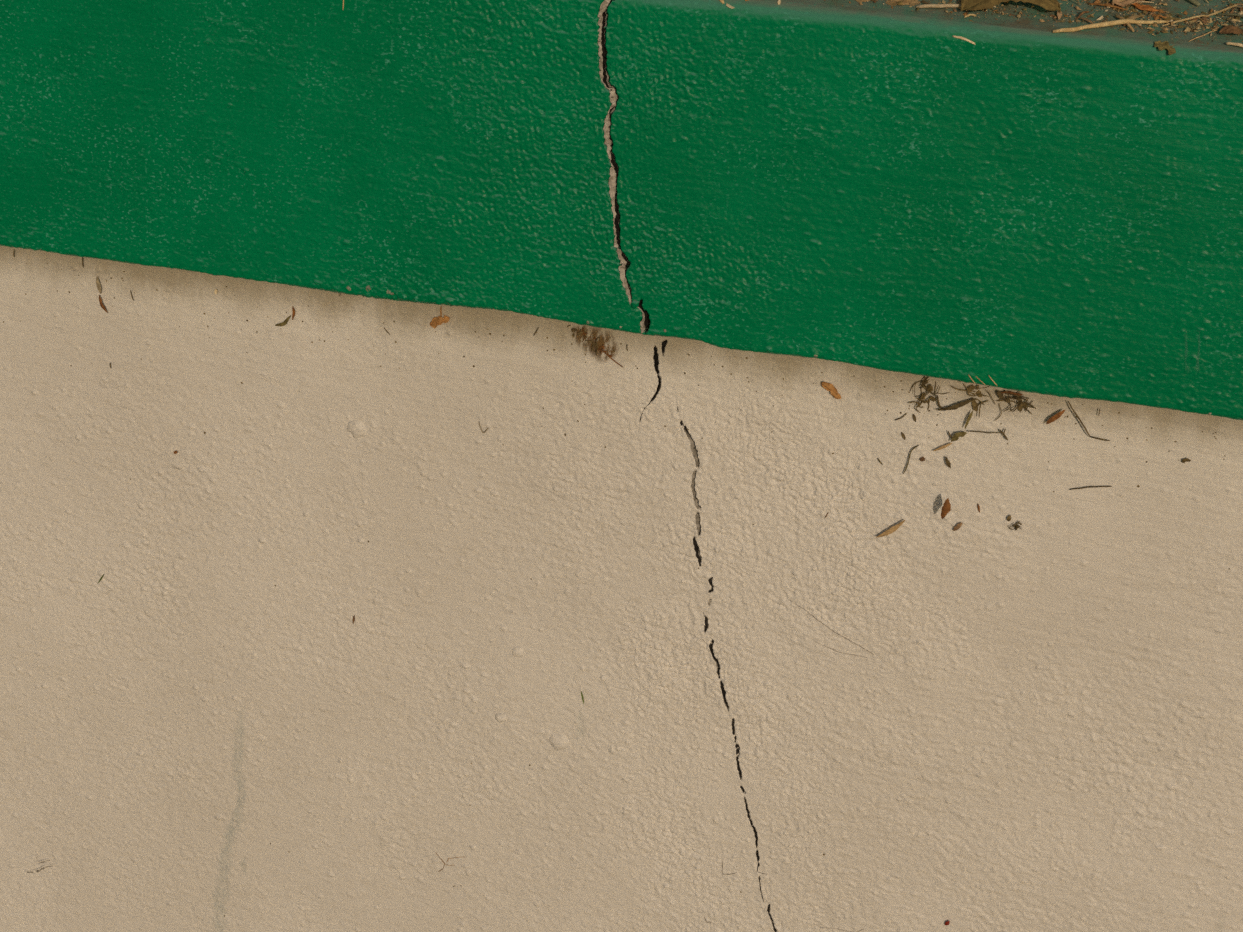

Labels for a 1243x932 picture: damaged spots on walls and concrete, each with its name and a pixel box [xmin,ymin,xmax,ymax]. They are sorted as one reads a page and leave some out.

crack [598,0,776,932]